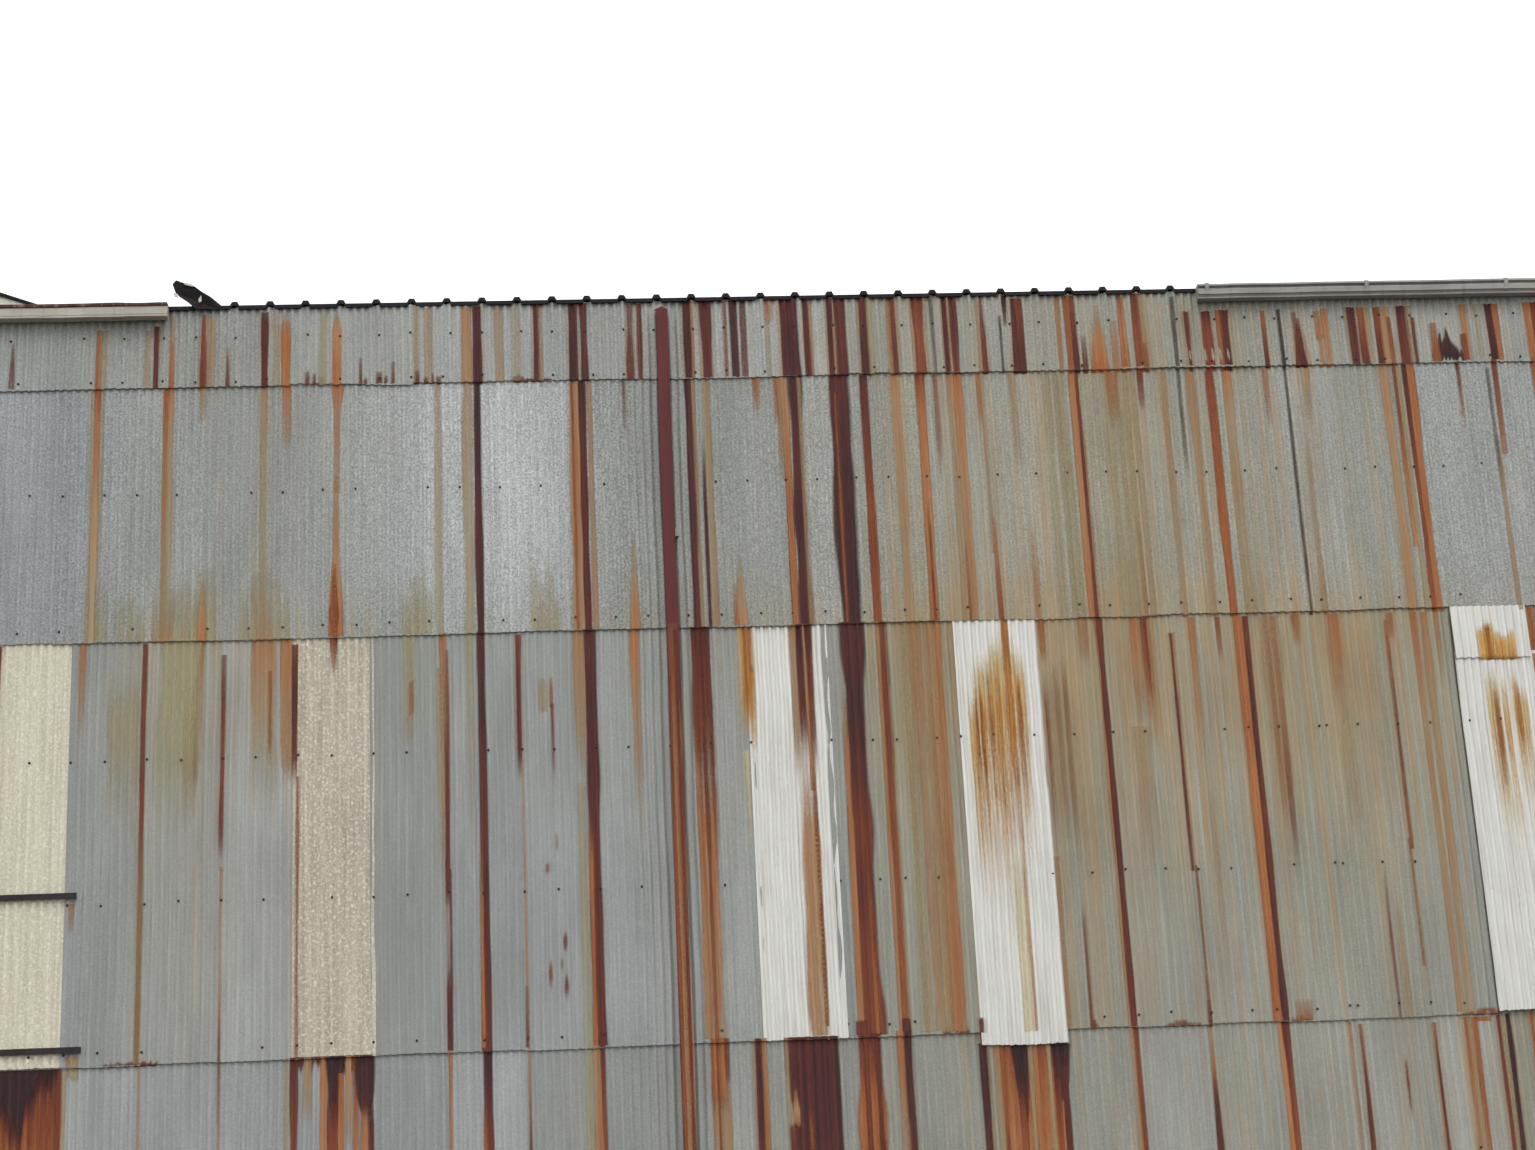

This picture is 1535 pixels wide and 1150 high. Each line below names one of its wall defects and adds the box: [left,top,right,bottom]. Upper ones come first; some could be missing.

corrosion [0,1057,78,1150]
corrosion [252,311,395,1150]
corrosion [415,310,453,1150]
corrosion [461,305,547,1150]
corrosion [539,683,554,755]
corrosion [568,303,608,1150]
corrosion [670,296,1074,1150]
corrosion [1045,293,1312,1150]
corrosion [1292,308,1333,401]
corrosion [1319,567,1342,676]
corrosion [1345,304,1530,1150]
corrosion [1478,302,1535,667]